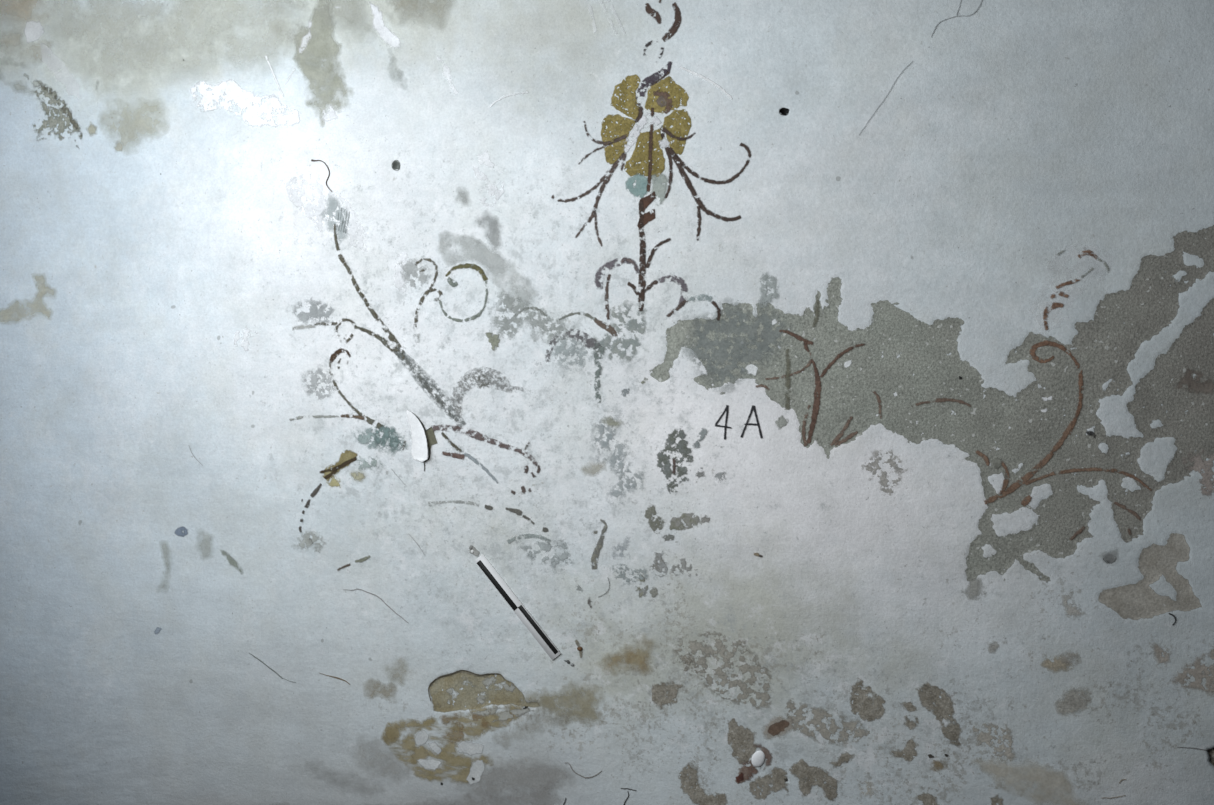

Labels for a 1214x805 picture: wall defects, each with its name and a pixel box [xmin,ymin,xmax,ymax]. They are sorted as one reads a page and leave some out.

water stain [294,0,361,112]
water stain [15,74,96,148]
water stain [111,105,158,151]
flaking render [622,225,1214,625]
peeling [652,632,771,709]
peeling [1172,649,1214,694]
peeling [728,718,756,764]
peeling [750,681,885,801]
peeling [892,683,1014,761]
crack [563,762,637,805]
peeling [680,764,727,805]
peeling [918,793,937,805]